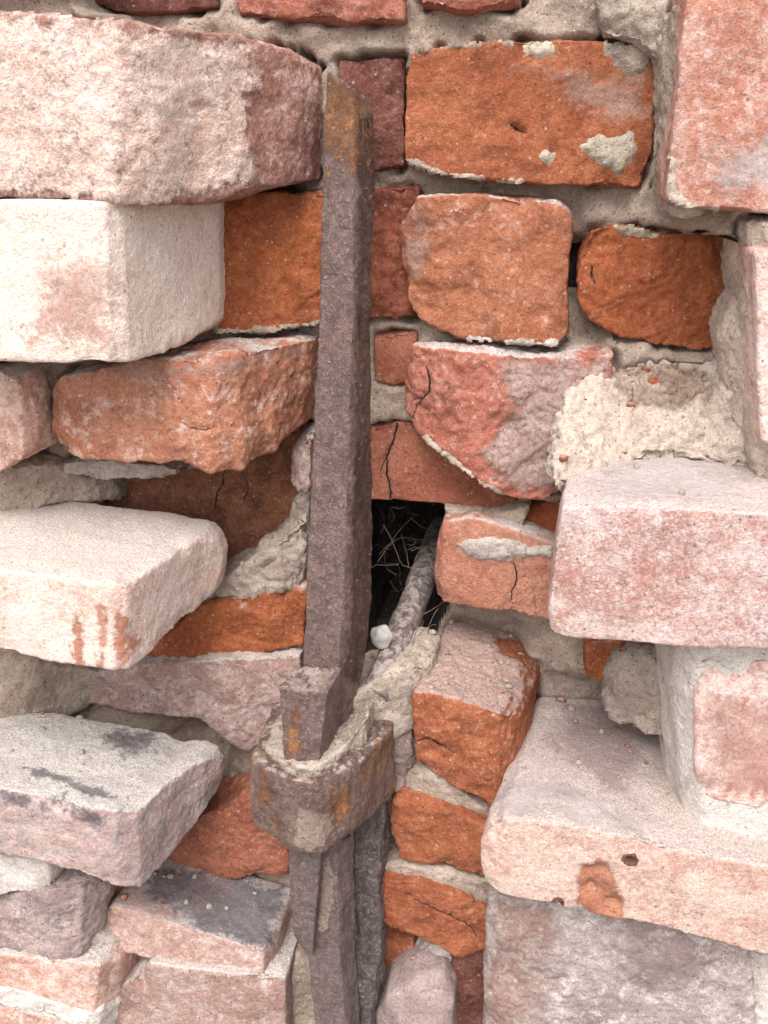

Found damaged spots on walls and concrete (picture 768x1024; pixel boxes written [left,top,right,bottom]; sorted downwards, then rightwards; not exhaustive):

rust [324,73,376,684]
crack [380,365,431,500]
crack [214,470,249,511]
crack [509,563,536,607]
rust [284,700,302,758]
crack [403,892,476,935]